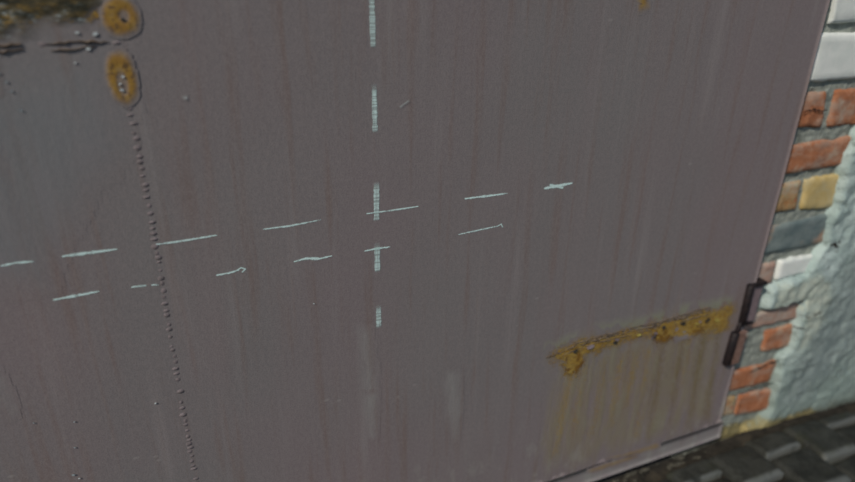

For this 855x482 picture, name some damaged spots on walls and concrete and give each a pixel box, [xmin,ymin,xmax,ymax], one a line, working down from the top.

corrosion [0,0,143,109]
corrosion [535,290,744,482]